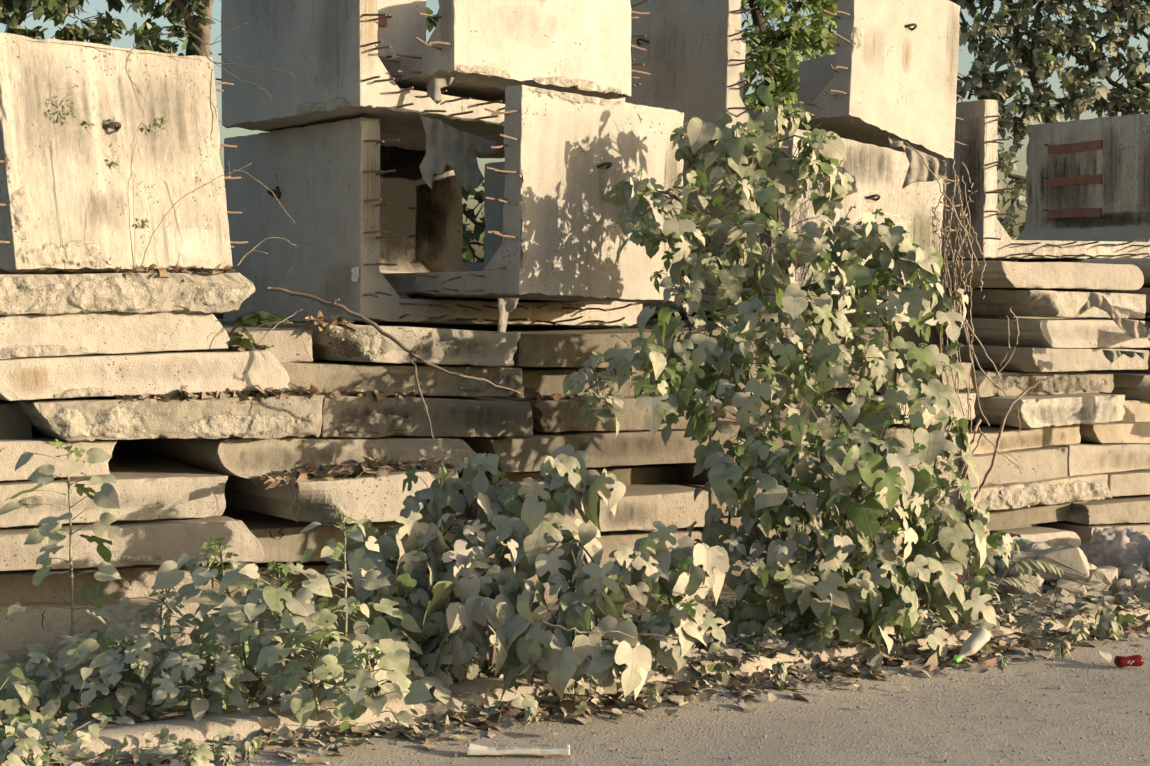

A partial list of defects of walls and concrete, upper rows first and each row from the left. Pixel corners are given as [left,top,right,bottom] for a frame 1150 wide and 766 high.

spalling [0,189,159,314]